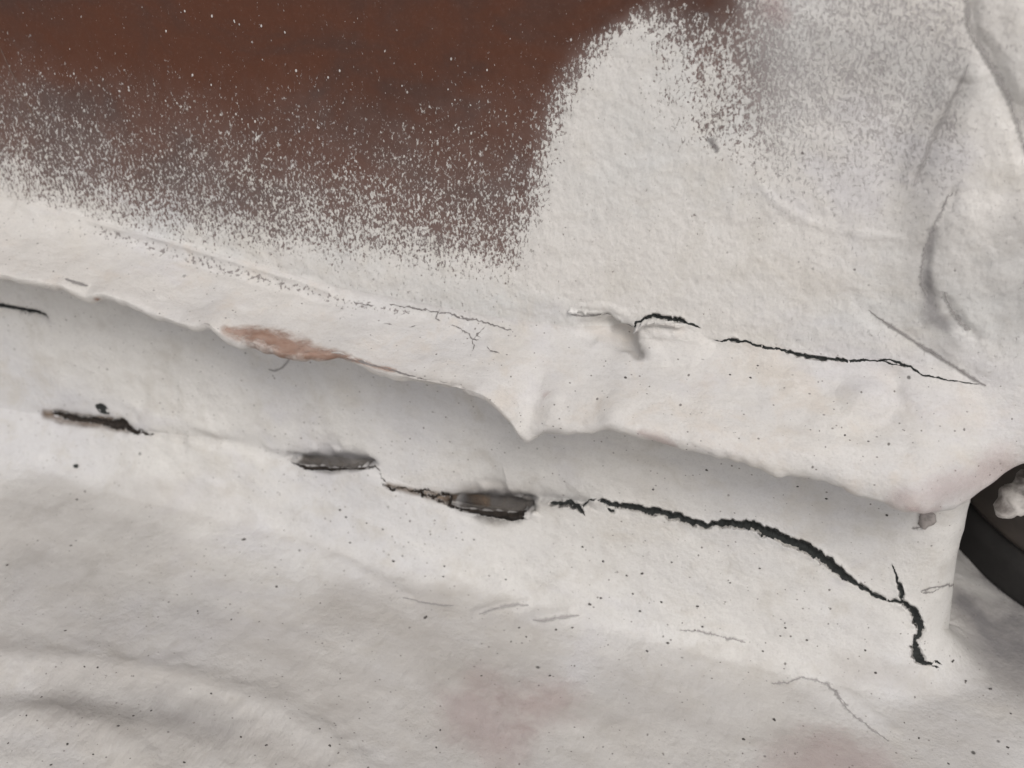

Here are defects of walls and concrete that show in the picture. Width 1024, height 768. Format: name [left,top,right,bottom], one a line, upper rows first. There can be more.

crack [0,303,48,317]
corrosion [225,328,363,364]
crack [574,313,973,384]
crack [52,412,154,436]
crack [379,473,464,511]
peeling [523,498,548,523]
crack [551,498,954,668]